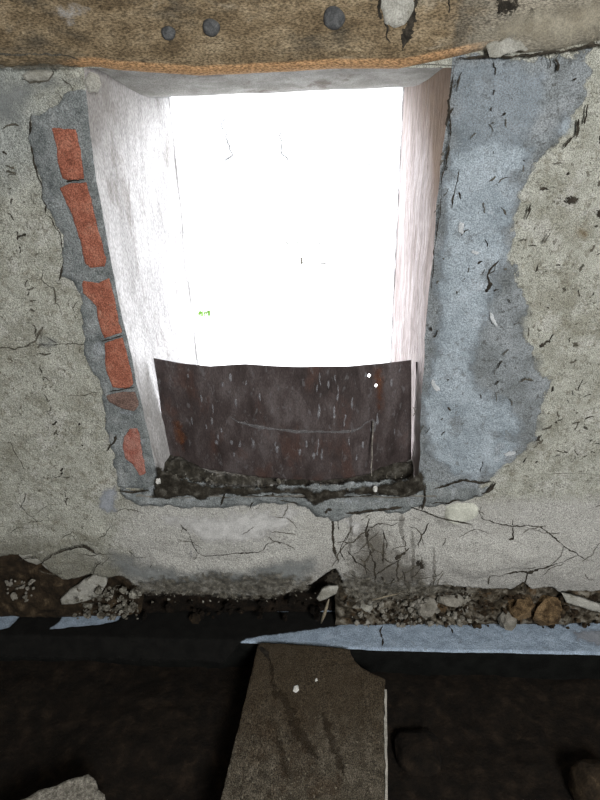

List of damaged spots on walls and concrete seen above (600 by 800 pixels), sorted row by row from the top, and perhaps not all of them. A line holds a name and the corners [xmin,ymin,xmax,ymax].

flaking render [29,72,157,489]
crack [7,494,47,534]
crack [180,503,297,559]
crack [331,515,436,602]
crack [429,462,600,593]